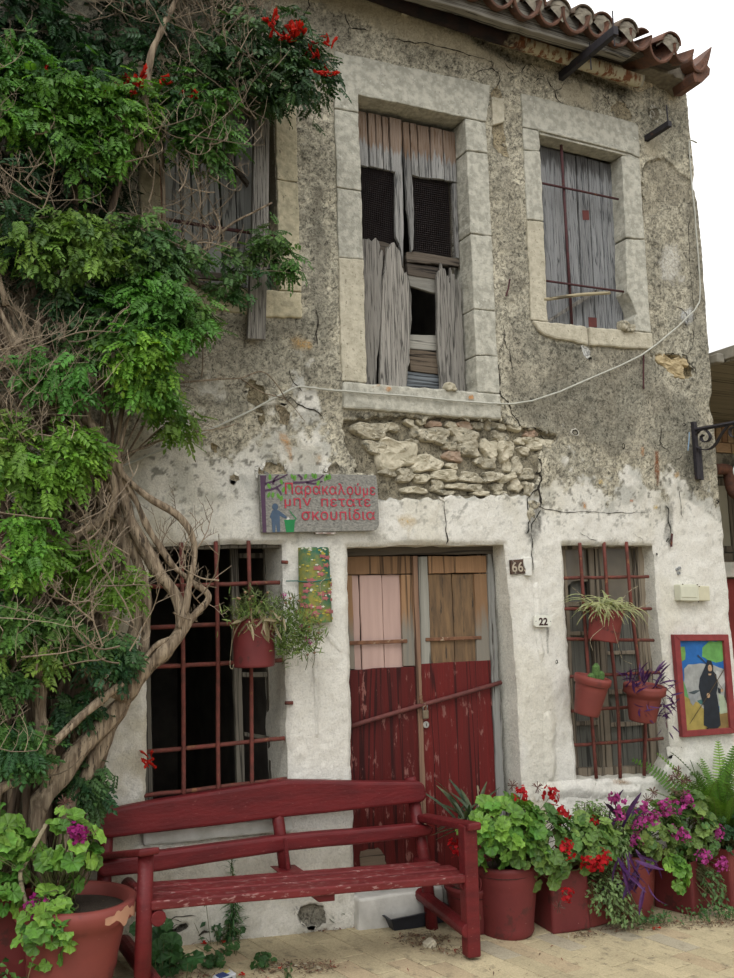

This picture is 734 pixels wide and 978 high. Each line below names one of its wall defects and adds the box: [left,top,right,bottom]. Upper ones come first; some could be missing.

crack [498,326,683,563]
spalling [651,352,692,379]